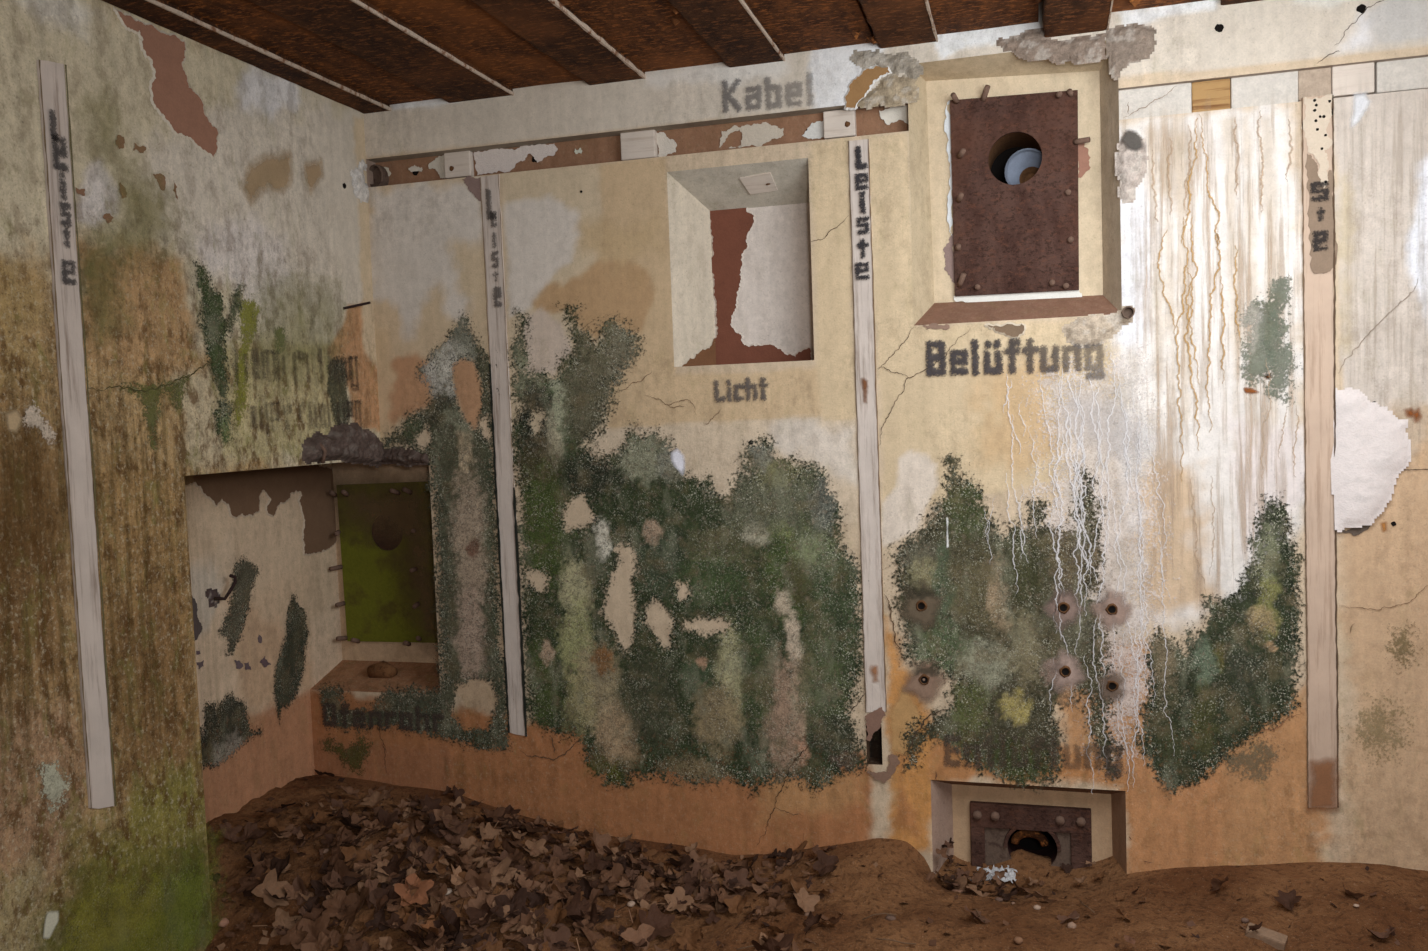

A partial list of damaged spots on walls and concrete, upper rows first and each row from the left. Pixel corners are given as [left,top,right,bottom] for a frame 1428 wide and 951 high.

peeling [153,173,178,199]
peeling [113,7,219,160]
peeling [657,132,677,157]
damp [1122,130,1143,150]
peeling [682,207,814,367]
damp [6,399,57,445]
peeling [184,422,431,556]
damp [672,450,684,473]
damp [1261,362,1299,475]
damp [985,355,1175,792]